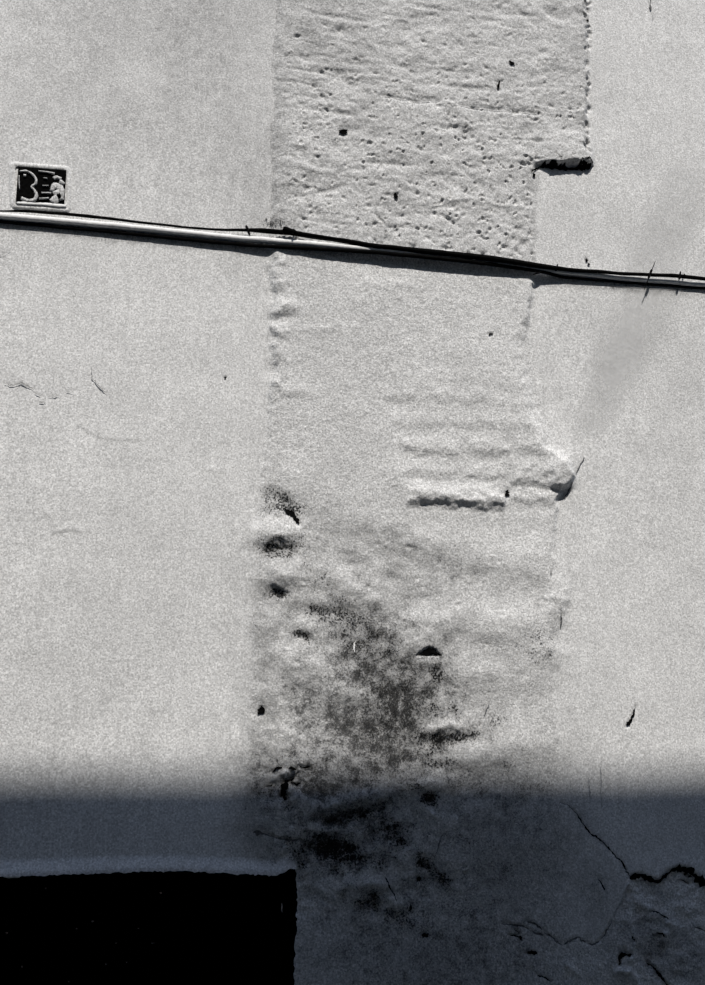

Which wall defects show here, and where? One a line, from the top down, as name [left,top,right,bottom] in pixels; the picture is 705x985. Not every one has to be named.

damp [253,532,310,558]
damp [260,485,305,518]
flaking render [375,379,564,513]
damp [269,588,394,677]
damp [365,663,480,773]
damp [260,754,454,896]
crack [560,767,705,887]
flaking render [490,871,705,985]